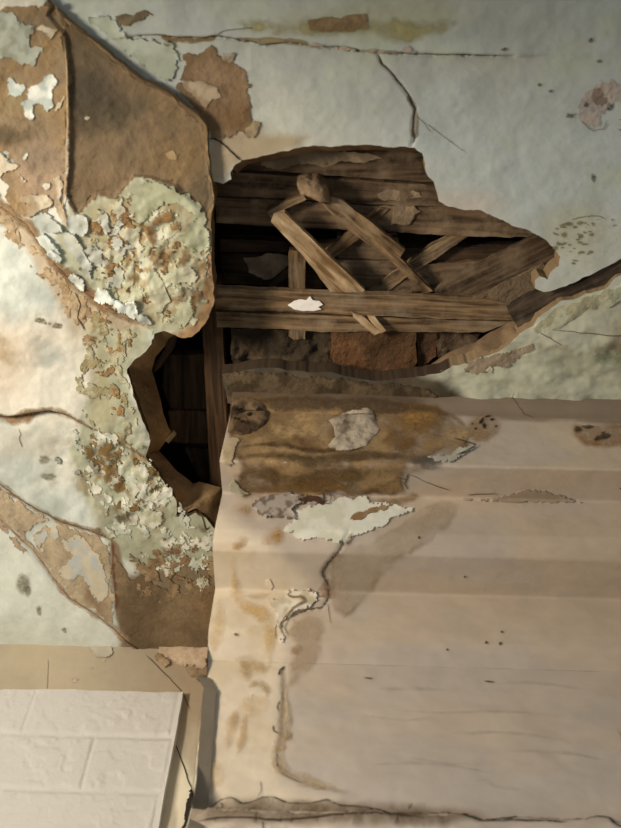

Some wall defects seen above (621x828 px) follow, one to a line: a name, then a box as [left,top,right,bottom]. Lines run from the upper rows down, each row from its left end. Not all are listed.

crack [162,28,321,47]
crack [348,48,498,152]
spalling [568,79,621,131]
flaking render [0,3,437,544]
spalling [432,320,535,375]
crack [0,407,143,457]
leakage [229,396,497,504]
peeling [462,489,582,504]
crack [0,484,190,708]
flaking render [0,489,215,682]
leakage [272,691,325,789]
crack [176,702,621,828]